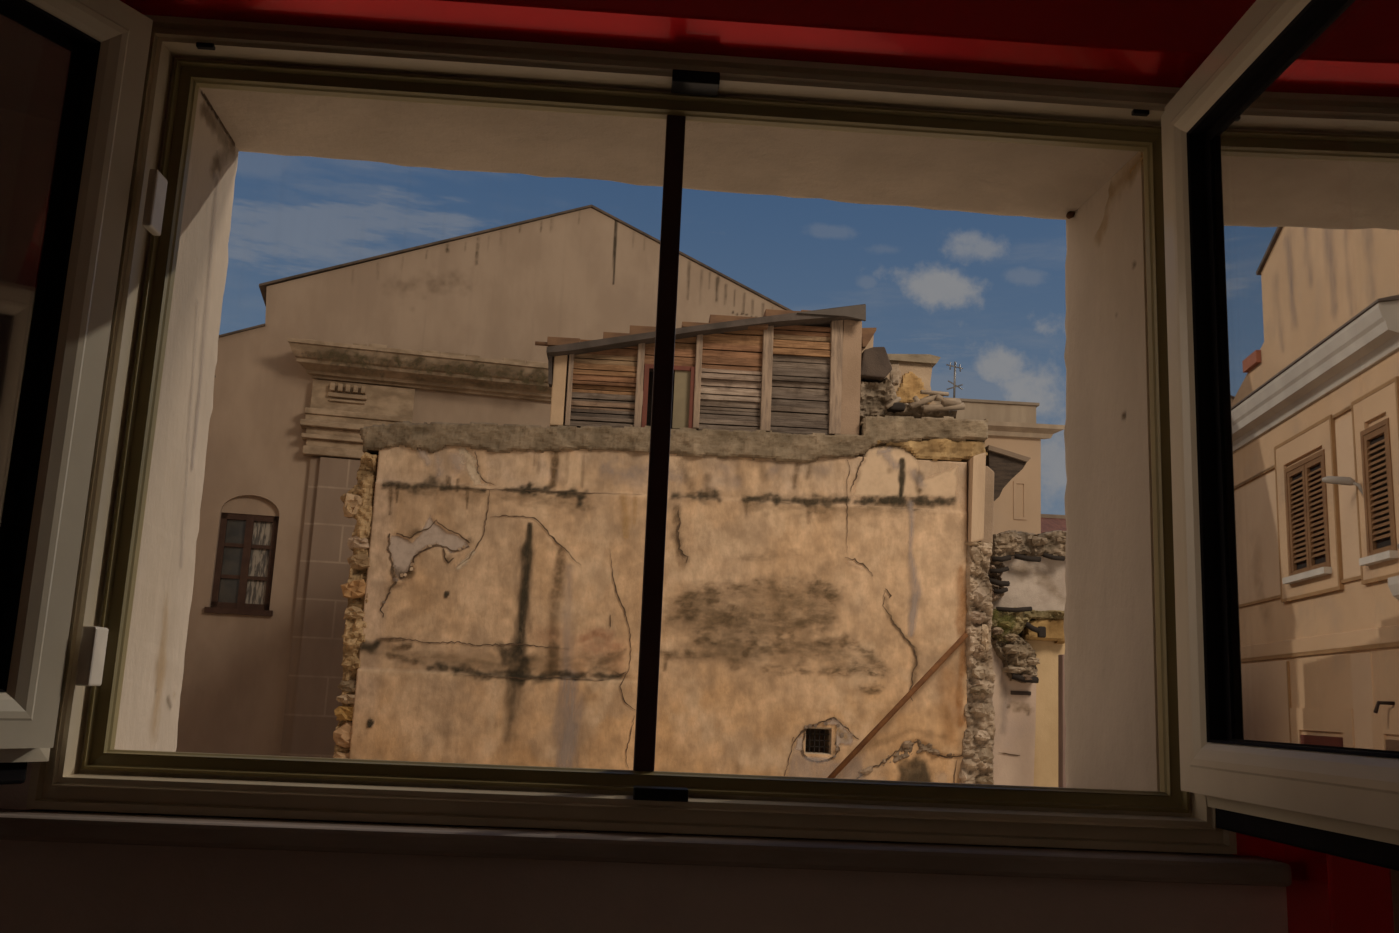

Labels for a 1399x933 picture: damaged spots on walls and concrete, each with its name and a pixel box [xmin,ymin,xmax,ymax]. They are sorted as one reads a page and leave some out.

peeling [380,518,470,617]
damp [360,523,622,767]
crack [457,490,635,768]
crack [676,510,688,562]
damp [672,490,720,500]
damp [742,458,954,536]
crack [845,459,918,701]
spalling [784,717,858,776]